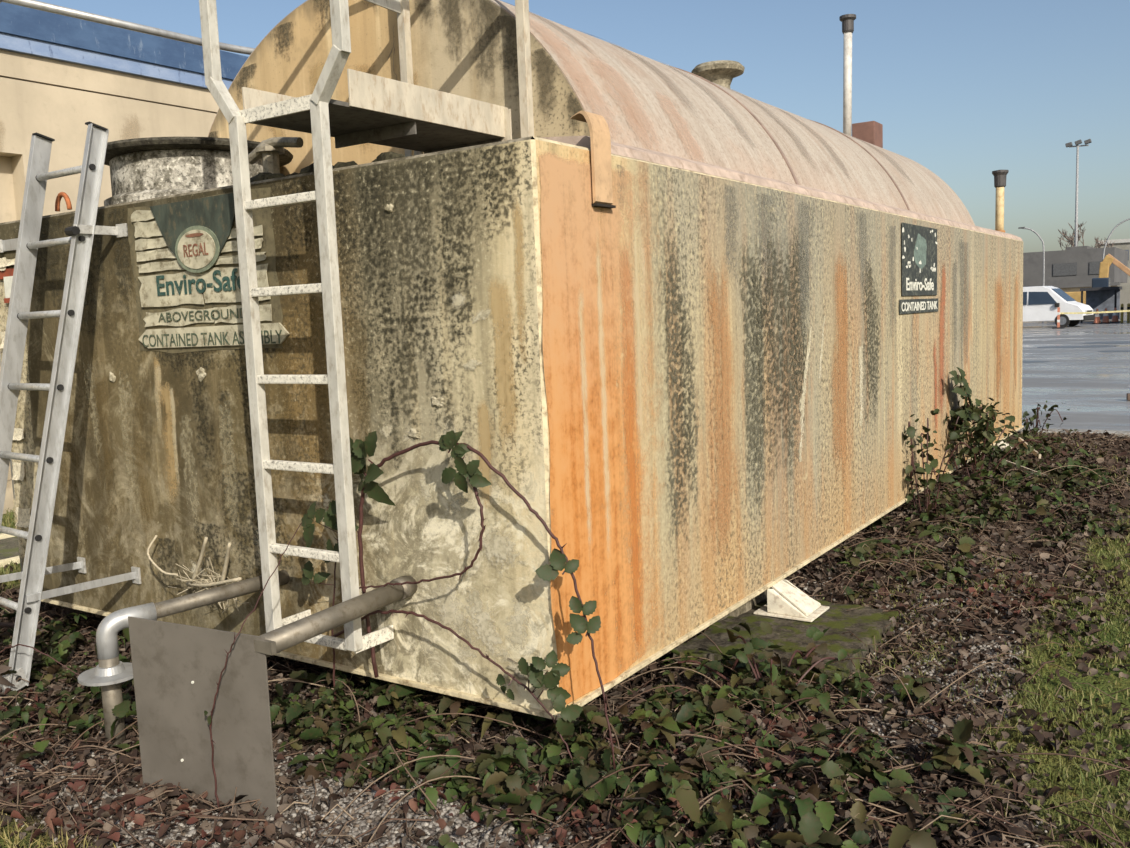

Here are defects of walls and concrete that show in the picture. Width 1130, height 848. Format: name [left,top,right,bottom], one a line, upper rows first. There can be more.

damp [84,209,131,332]
damp [157,349,253,458]
damp [333,144,516,460]
corrosion [539,153,657,705]
damp [663,244,699,540]
damp [740,228,809,506]
damp [863,266,880,418]
corrosion [934,269,946,423]
corrosion [994,281,1018,392]
damp [195,523,222,579]
damp [221,472,259,579]
damp [273,499,289,567]